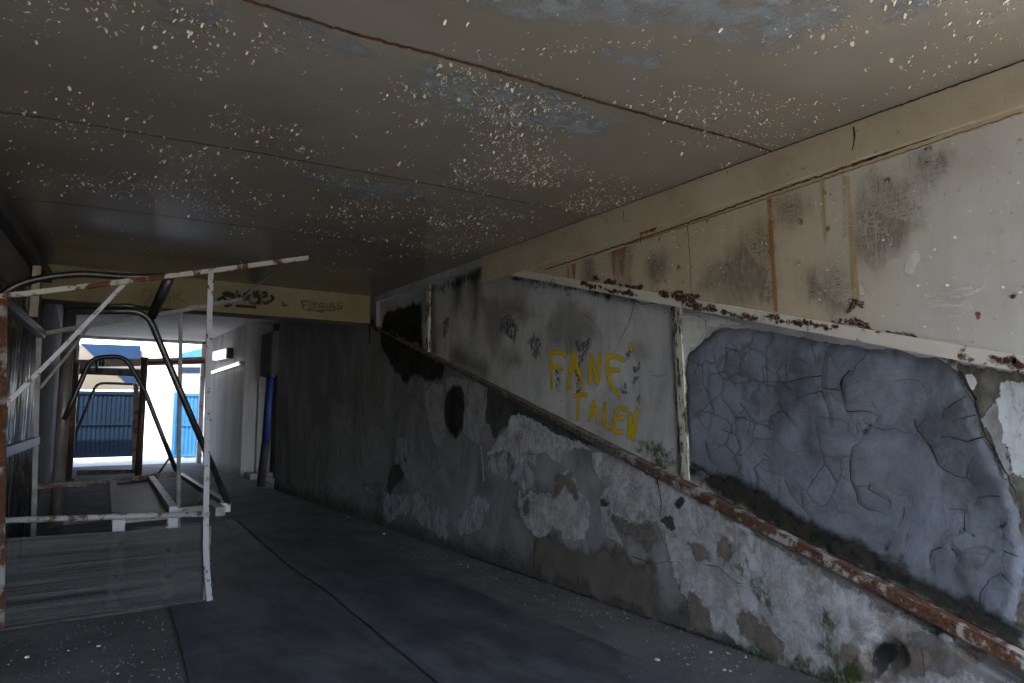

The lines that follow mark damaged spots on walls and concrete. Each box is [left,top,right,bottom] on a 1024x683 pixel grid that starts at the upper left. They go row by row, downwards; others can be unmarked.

rust [767,198,777,311]
crack [695,347,1019,570]
peeling [988,354,1024,478]
peeling [424,374,985,683]
crack [979,551,1018,606]